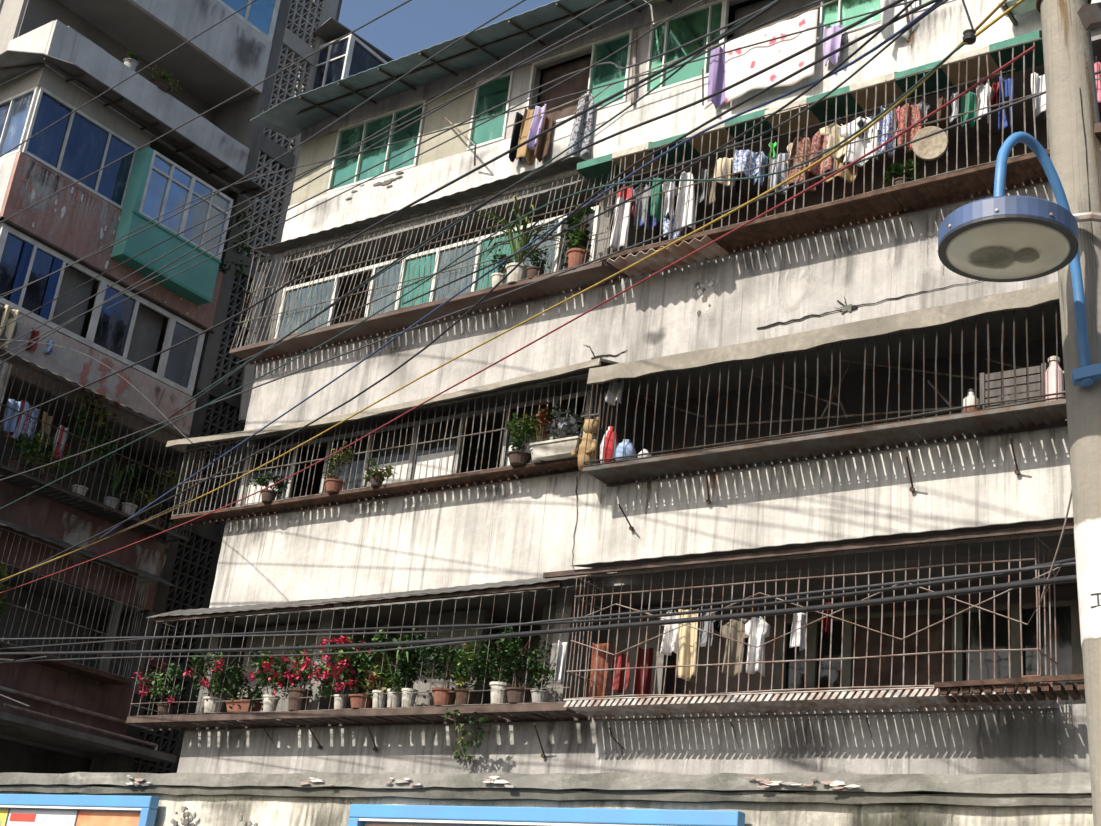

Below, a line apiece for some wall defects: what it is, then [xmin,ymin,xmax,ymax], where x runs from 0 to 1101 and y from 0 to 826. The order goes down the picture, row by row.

leakage [926,242,942,271]
flaking render [695,281,713,316]
peeling [79,347,130,411]
leakage [982,720,1058,774]
spalling [747,777,863,790]